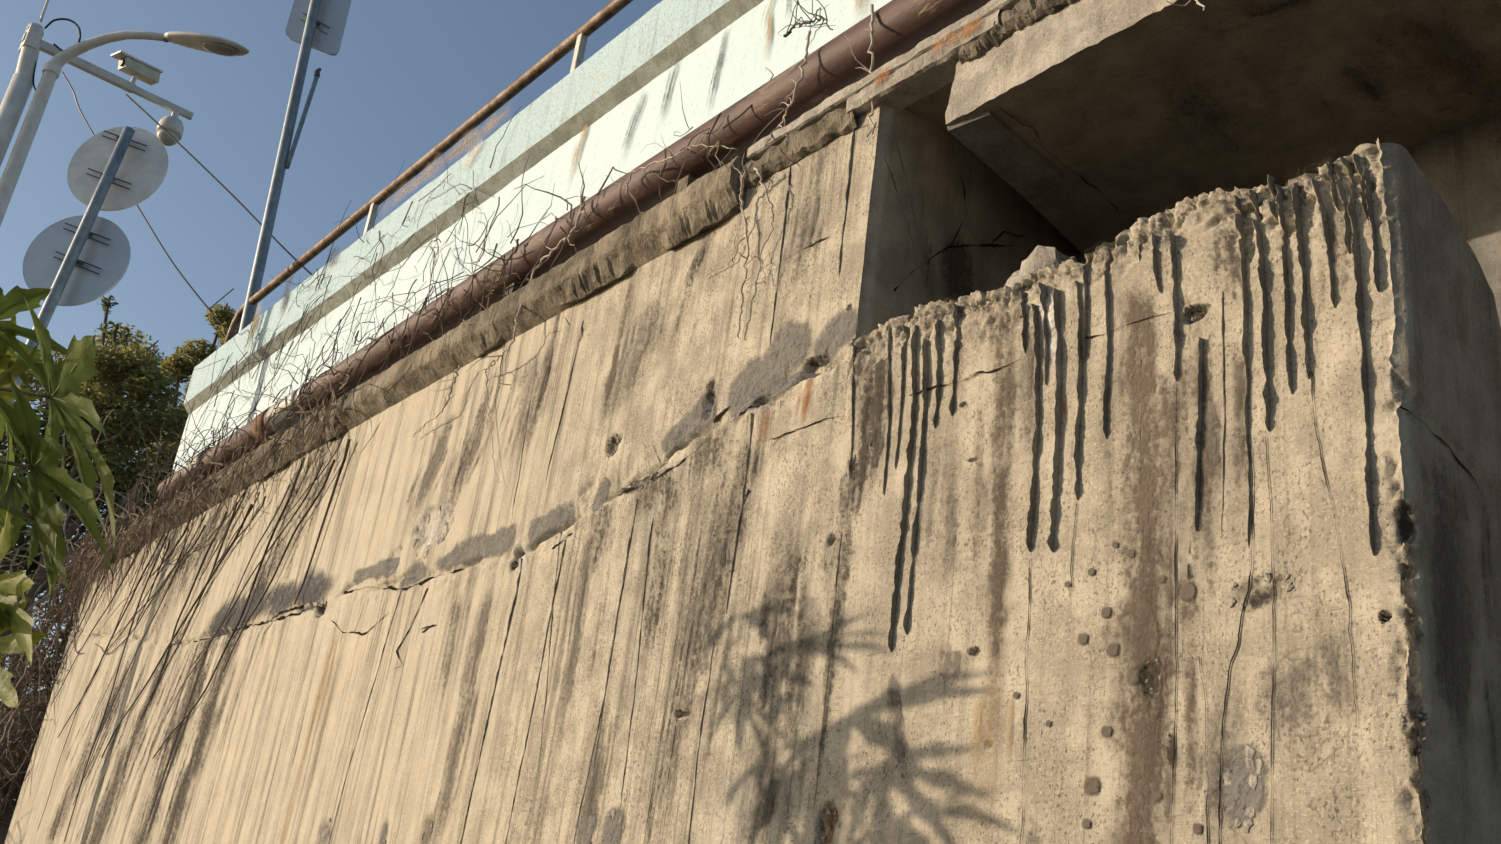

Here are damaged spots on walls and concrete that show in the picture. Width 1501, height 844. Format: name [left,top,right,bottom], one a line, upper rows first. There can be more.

corrosion [846,9,1005,118]
damp [839,118,856,275]
crack [617,405,837,496]
crack [909,359,1020,396]
damp [734,150,1365,844]
spalling [1183,304,1209,323]
damp [48,443,352,844]
damp [328,589,402,844]
crack [1170,436,1294,844]
spalling [1399,710,1428,759]